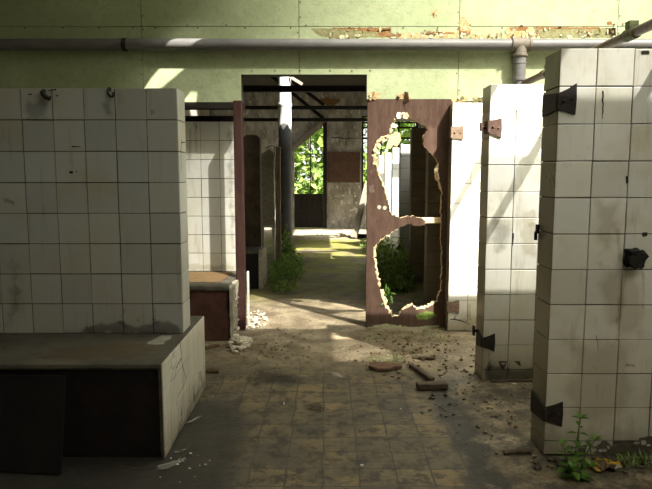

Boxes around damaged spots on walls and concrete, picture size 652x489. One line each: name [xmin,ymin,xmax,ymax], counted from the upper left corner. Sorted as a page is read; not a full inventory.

peeling [312,17,624,39]
peeling [373,112,409,165]